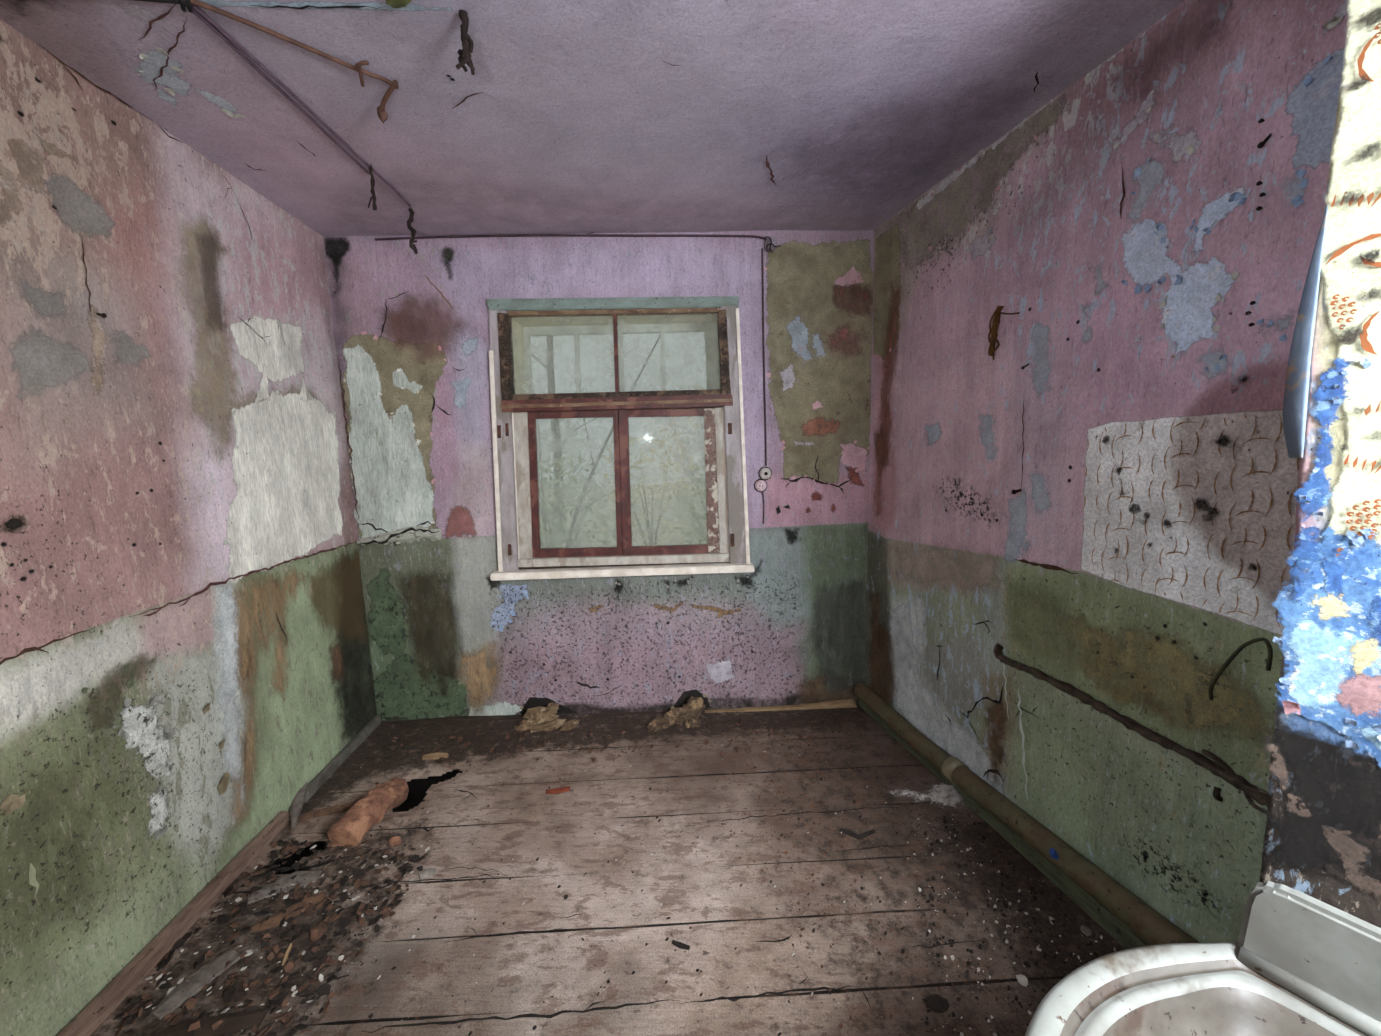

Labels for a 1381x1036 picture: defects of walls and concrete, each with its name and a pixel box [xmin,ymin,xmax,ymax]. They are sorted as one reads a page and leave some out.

crack [39,4,187,143]
crack [253,3,382,11]
peeling [1284,48,1346,208]
damp [196,234,223,328]
peeling [763,94,1066,487]
crack [0,630,90,665]
spalling [82,656,176,840]
peeling [184,220,448,825]
damp [333,555,377,738]
damp [401,574,460,695]
damp [1071,614,1264,739]
peeling [1271,358,1381,768]